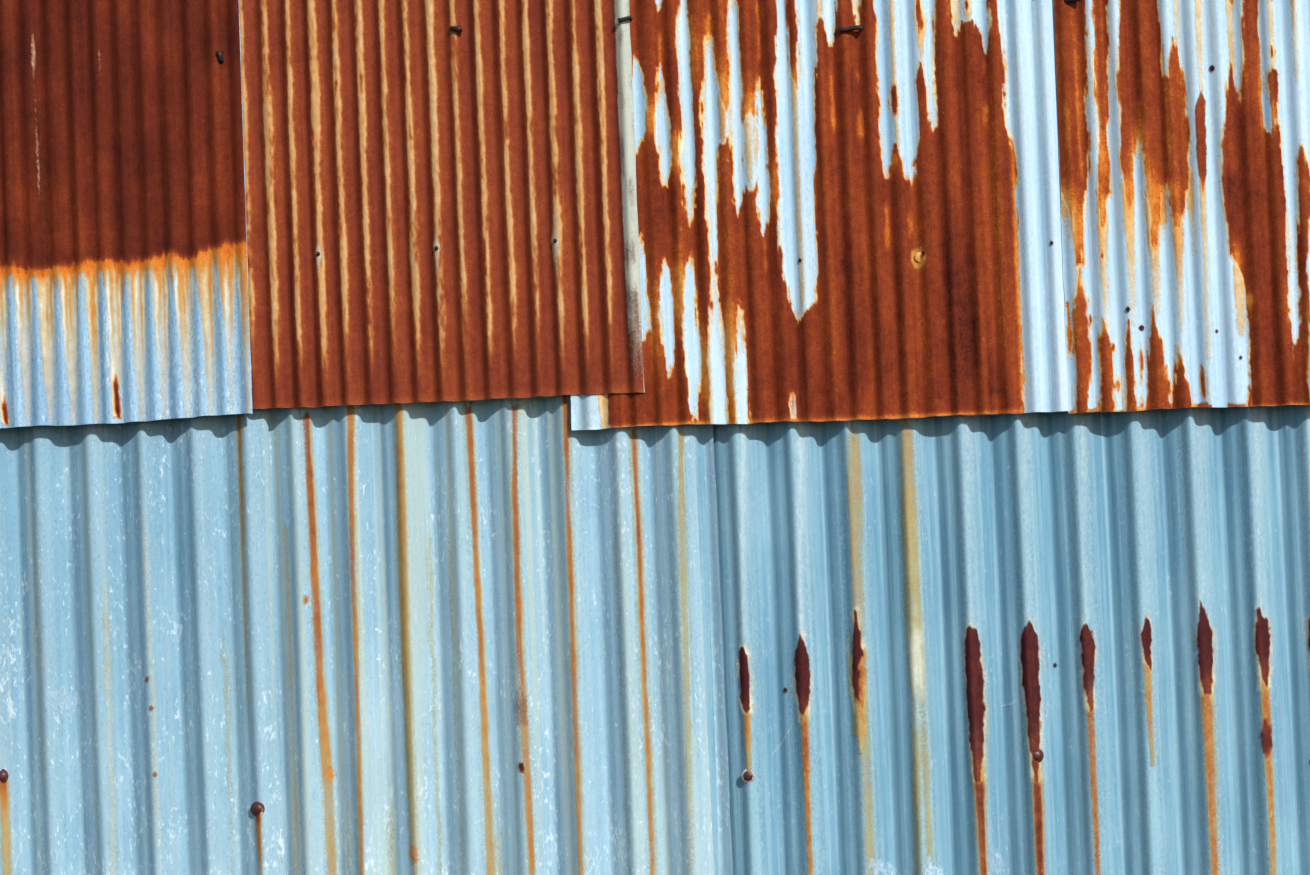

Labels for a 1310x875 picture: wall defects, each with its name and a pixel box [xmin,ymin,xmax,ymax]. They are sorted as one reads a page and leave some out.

rust [1054,0,1310,413]
rust [0,0,1026,875]
rust [1018,621,1046,875]
rust [1079,619,1101,875]
rust [1139,612,1155,766]
rust [1195,600,1219,875]
rust [1253,606,1277,875]